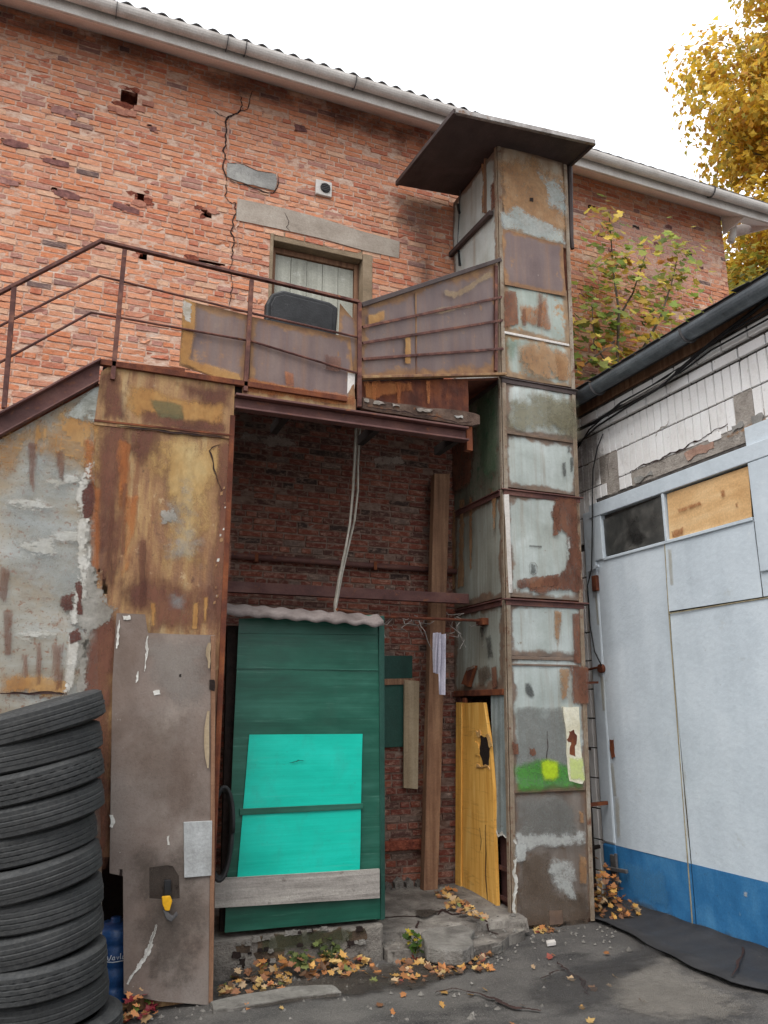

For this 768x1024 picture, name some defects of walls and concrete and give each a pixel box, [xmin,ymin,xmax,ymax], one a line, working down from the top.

spalling [108,85,158,133]
crack [213,91,279,305]
corrosion [481,156,566,234]
corrosion [504,290,570,381]
corrosion [366,382,411,403]
corrosion [0,299,354,630]
peeling [630,408,768,486]
corrosion [0,568,11,655]
peeling [64,463,118,692]
corrosion [515,496,583,593]
corrosion [554,611,589,704]
peeling [512,796,584,914]